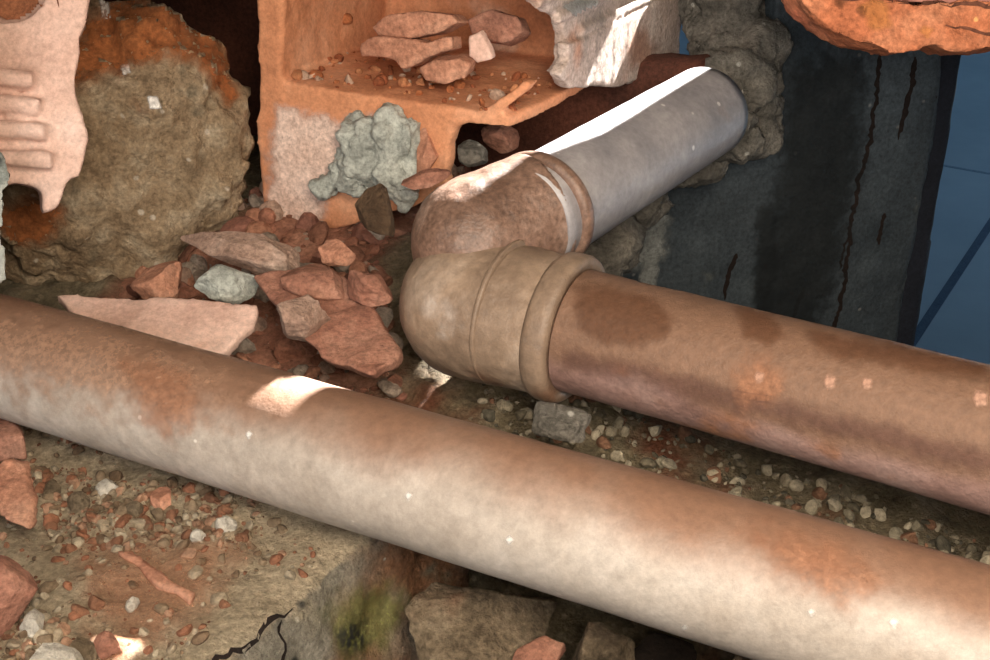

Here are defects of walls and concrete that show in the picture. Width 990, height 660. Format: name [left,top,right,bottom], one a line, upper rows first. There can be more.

spalling [781,0,990,56]
crack [843,0,990,36]
crack [832,55,917,328]
crack [212,608,293,660]